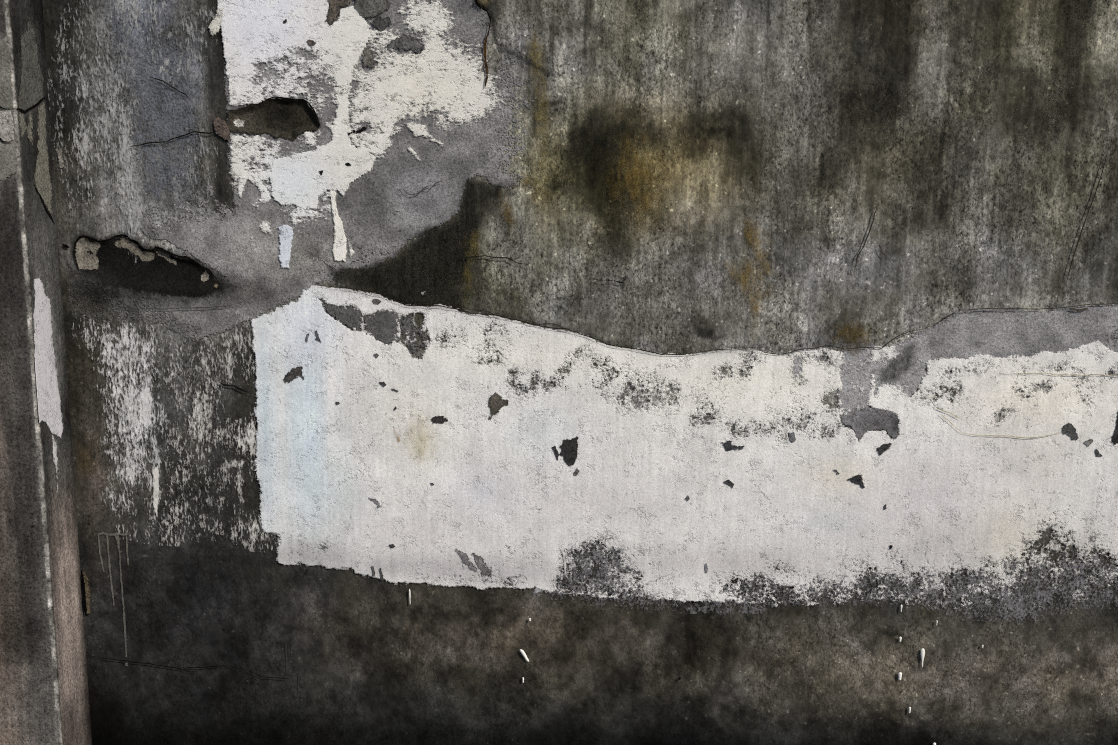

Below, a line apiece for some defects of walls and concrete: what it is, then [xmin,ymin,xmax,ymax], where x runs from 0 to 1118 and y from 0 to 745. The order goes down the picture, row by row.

crack [475,0,491,87]
crack [0,97,46,114]
peeling [67,0,1118,614]
peeling [33,278,63,492]
leakage [152,466,160,515]
leakage [97,532,129,606]